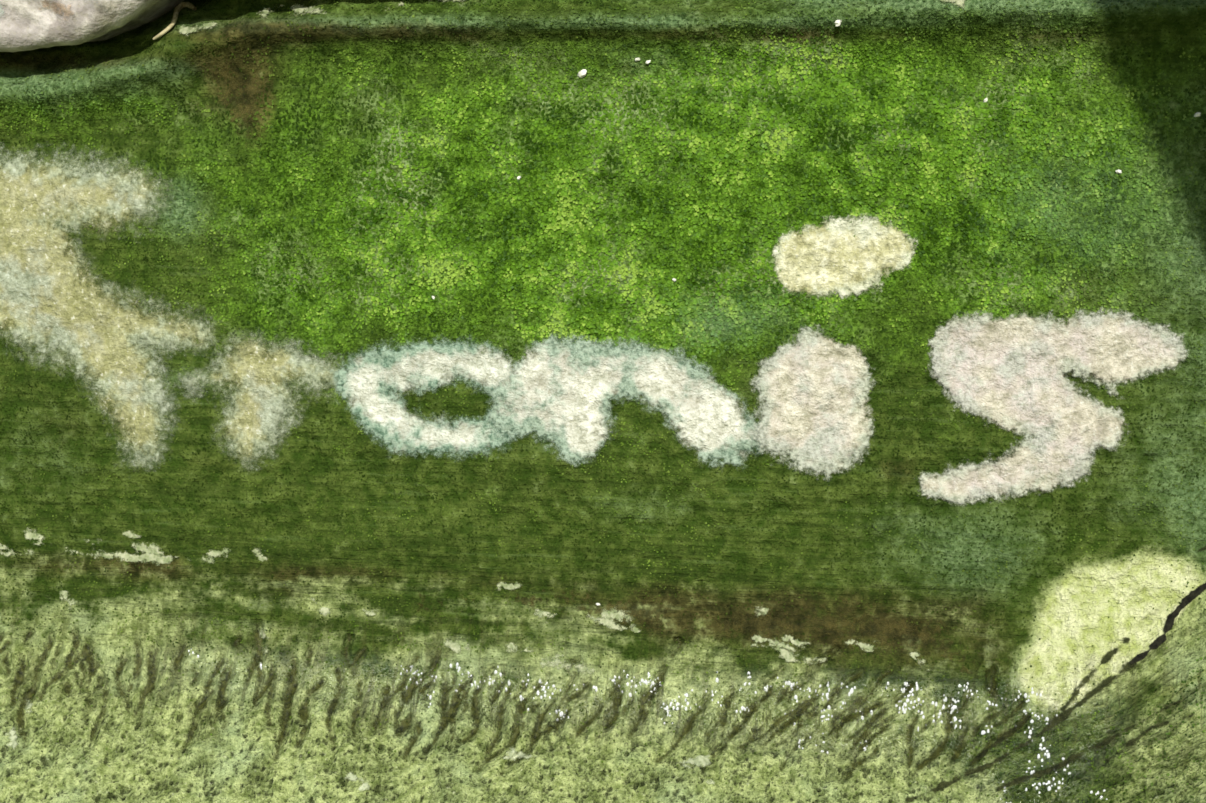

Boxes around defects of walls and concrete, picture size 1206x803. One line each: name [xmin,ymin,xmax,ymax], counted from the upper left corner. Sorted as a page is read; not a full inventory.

damp [716,601,964,665]
damp [0,632,158,748]
damp [185,624,590,775]
damp [576,672,664,739]
damp [656,704,705,762]
damp [706,670,913,780]
damp [906,670,1025,770]
crack [906,583,1206,802]